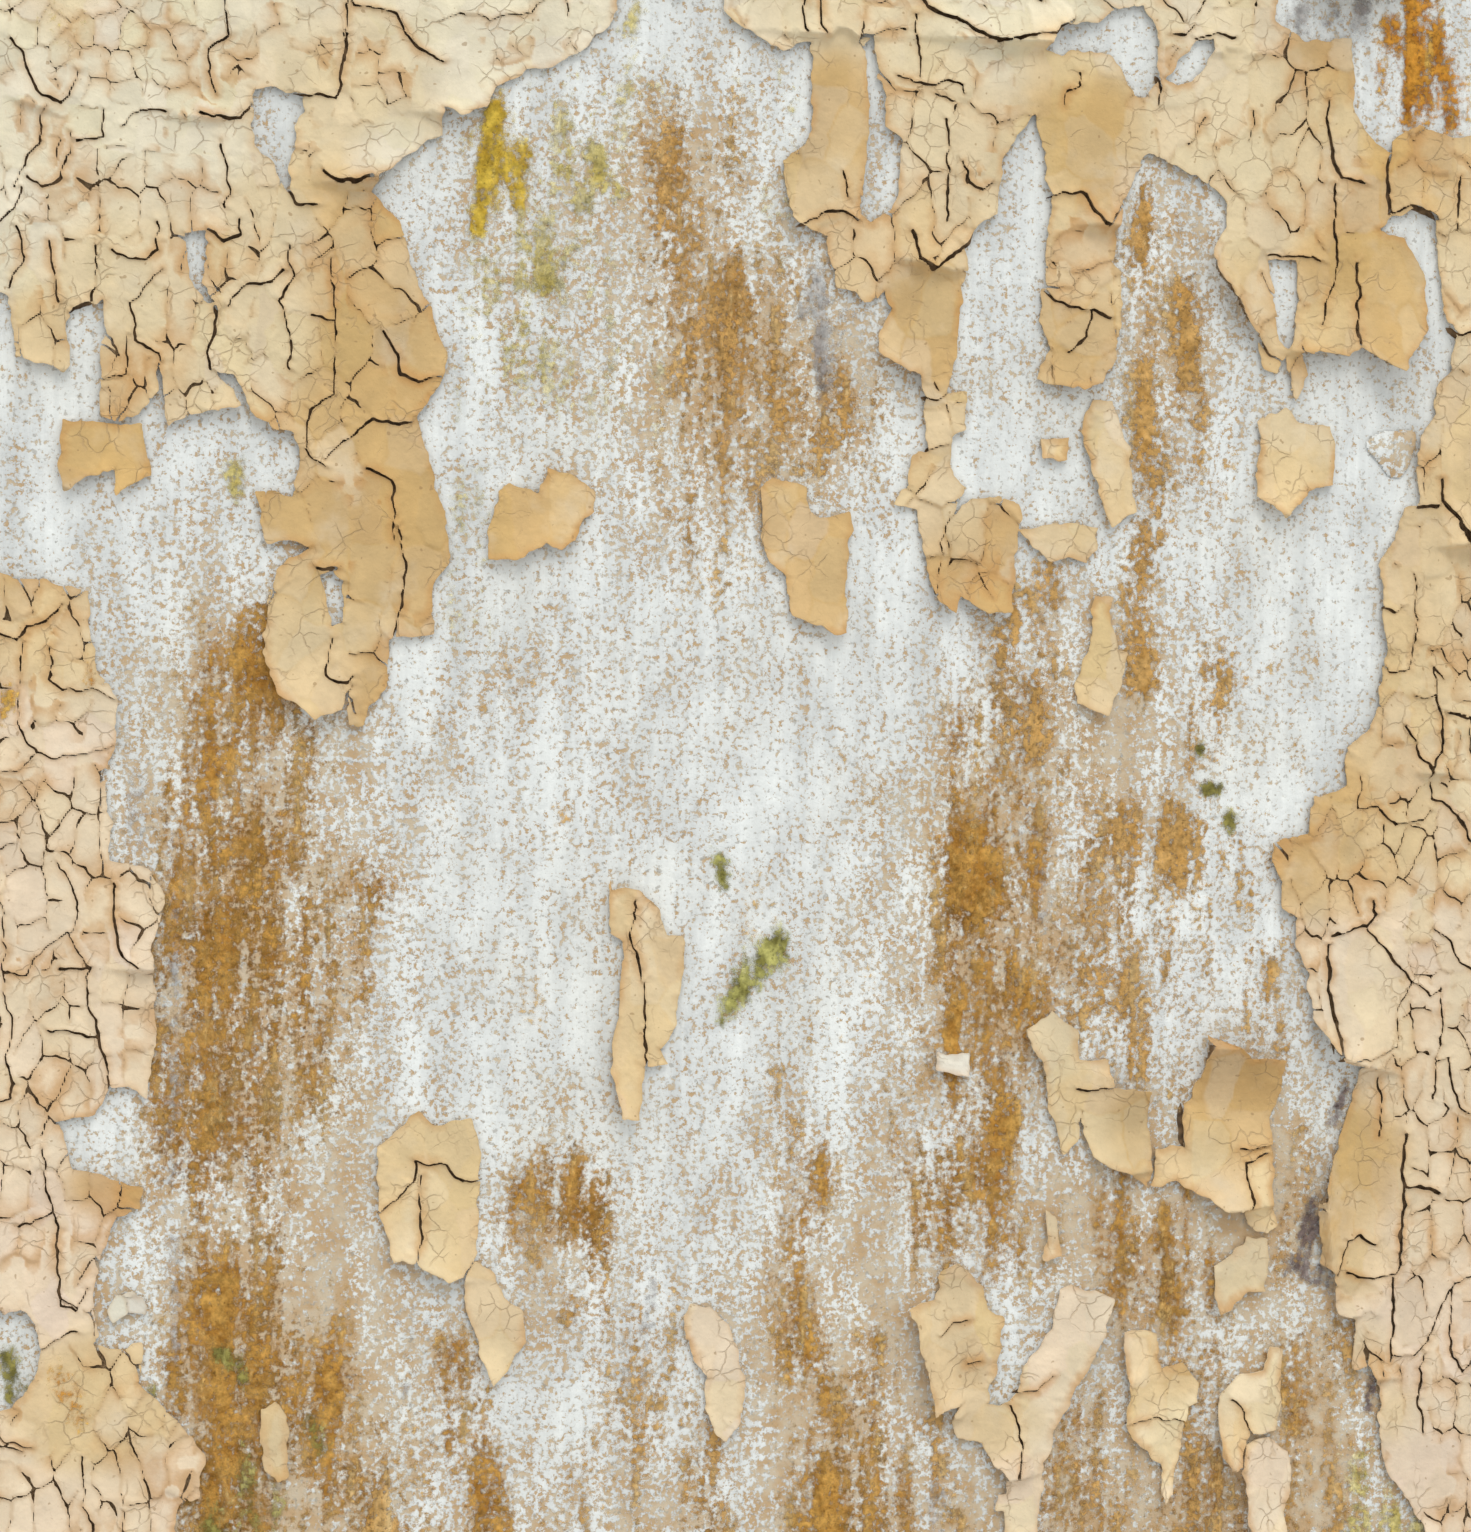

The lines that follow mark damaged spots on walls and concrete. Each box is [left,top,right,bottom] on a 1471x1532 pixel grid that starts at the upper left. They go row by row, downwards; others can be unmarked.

crack [0,0,251,380]
crack [206,246,411,636]
peeling [0,0,618,727]
corrosion [609,81,888,628]
peeling [723,0,1471,635]
corrosion [1115,174,1239,715]
crack [0,862,137,1102]
peeling [0,573,215,1532]
corrosion [134,582,518,1532]
corrosion [871,559,1303,1300]
peeling [1272,333,1471,1532]
crack [1326,905,1471,1424]